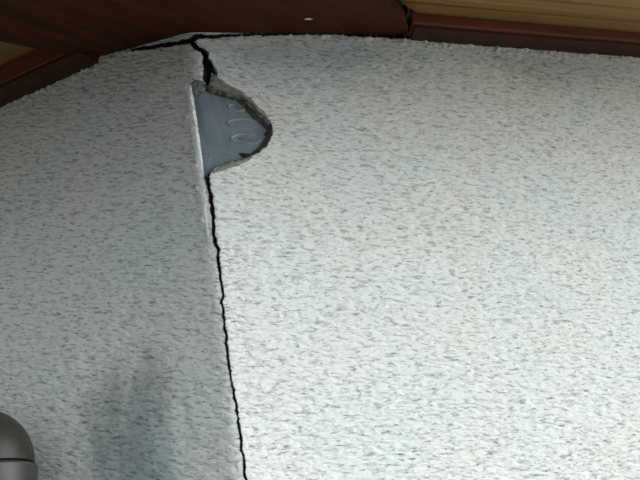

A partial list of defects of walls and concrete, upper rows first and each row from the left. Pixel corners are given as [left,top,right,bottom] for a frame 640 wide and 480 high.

crack [130,33,411,92]
spalling [183,73,273,237]
crack [205,174,247,480]